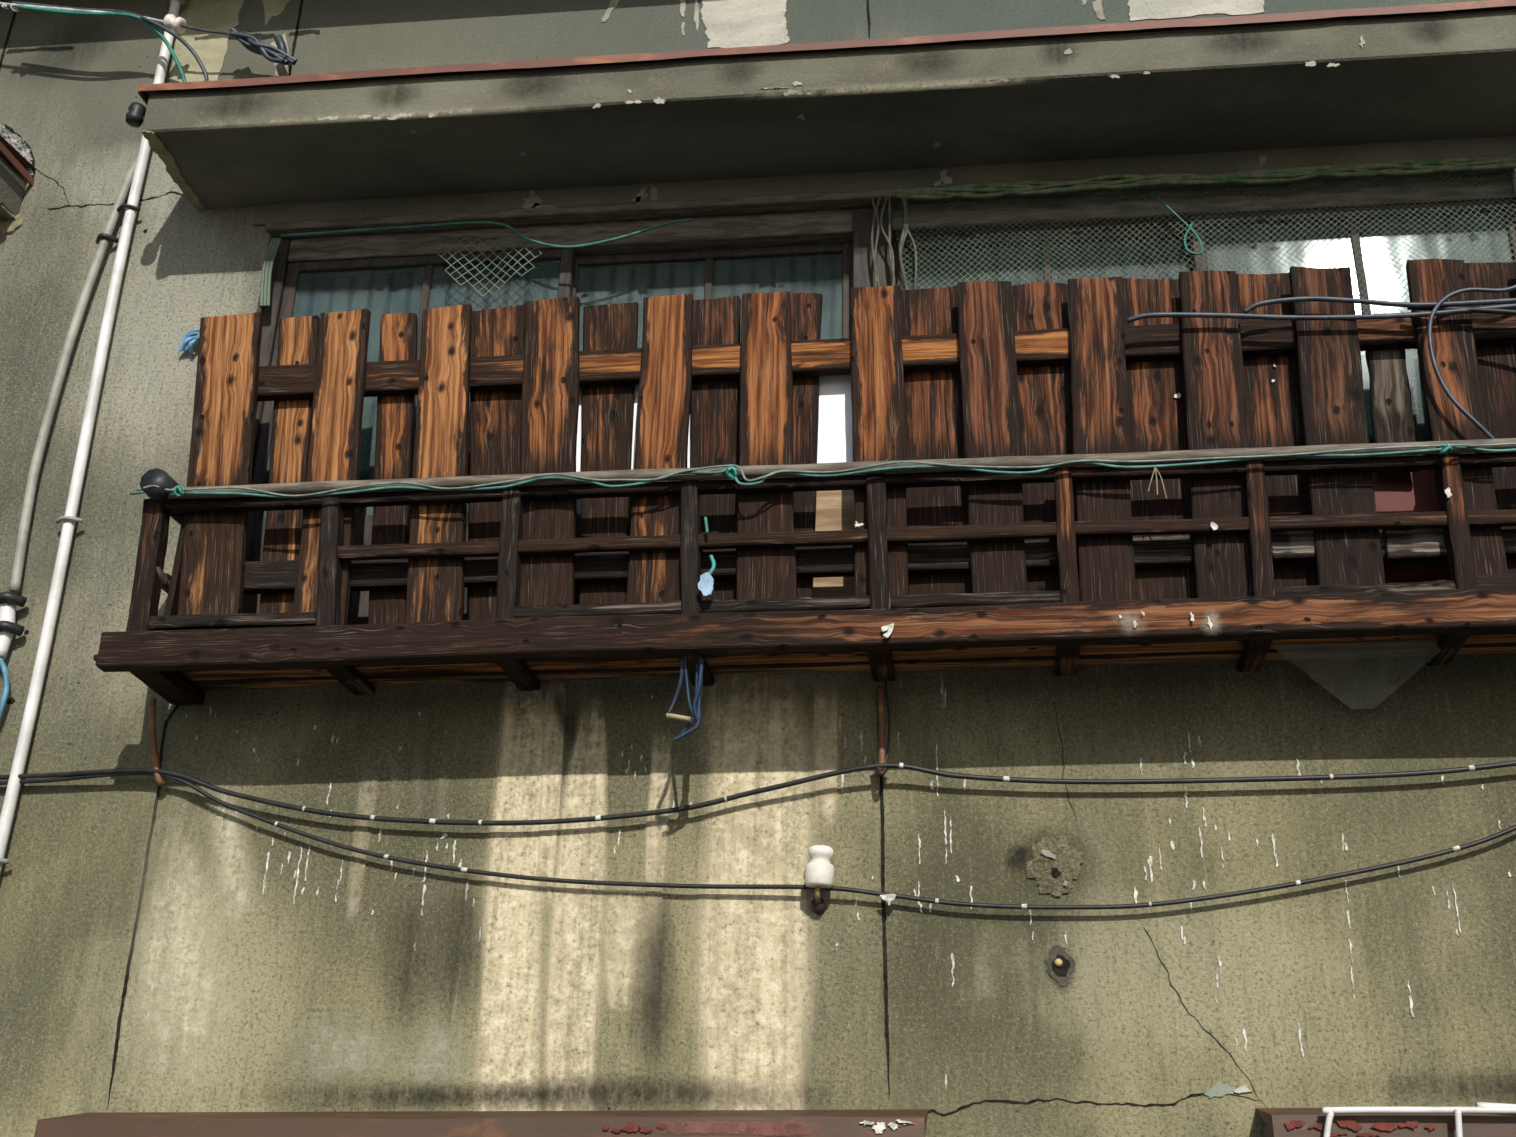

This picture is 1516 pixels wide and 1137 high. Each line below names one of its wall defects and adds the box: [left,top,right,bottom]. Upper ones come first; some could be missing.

peeling [169,0,244,83]
peeling [262,0,291,77]
peeling [680,0,790,49]
peeling [1127,0,1265,22]
crack [108,705,179,1103]
damp [262,780,382,916]
damp [374,675,866,1111]
crack [879,776,890,1096]
spalling [1012,835,1083,897]
damp [1134,818,1174,903]
damp [1184,787,1231,869]
crack [928,927,1263,1116]